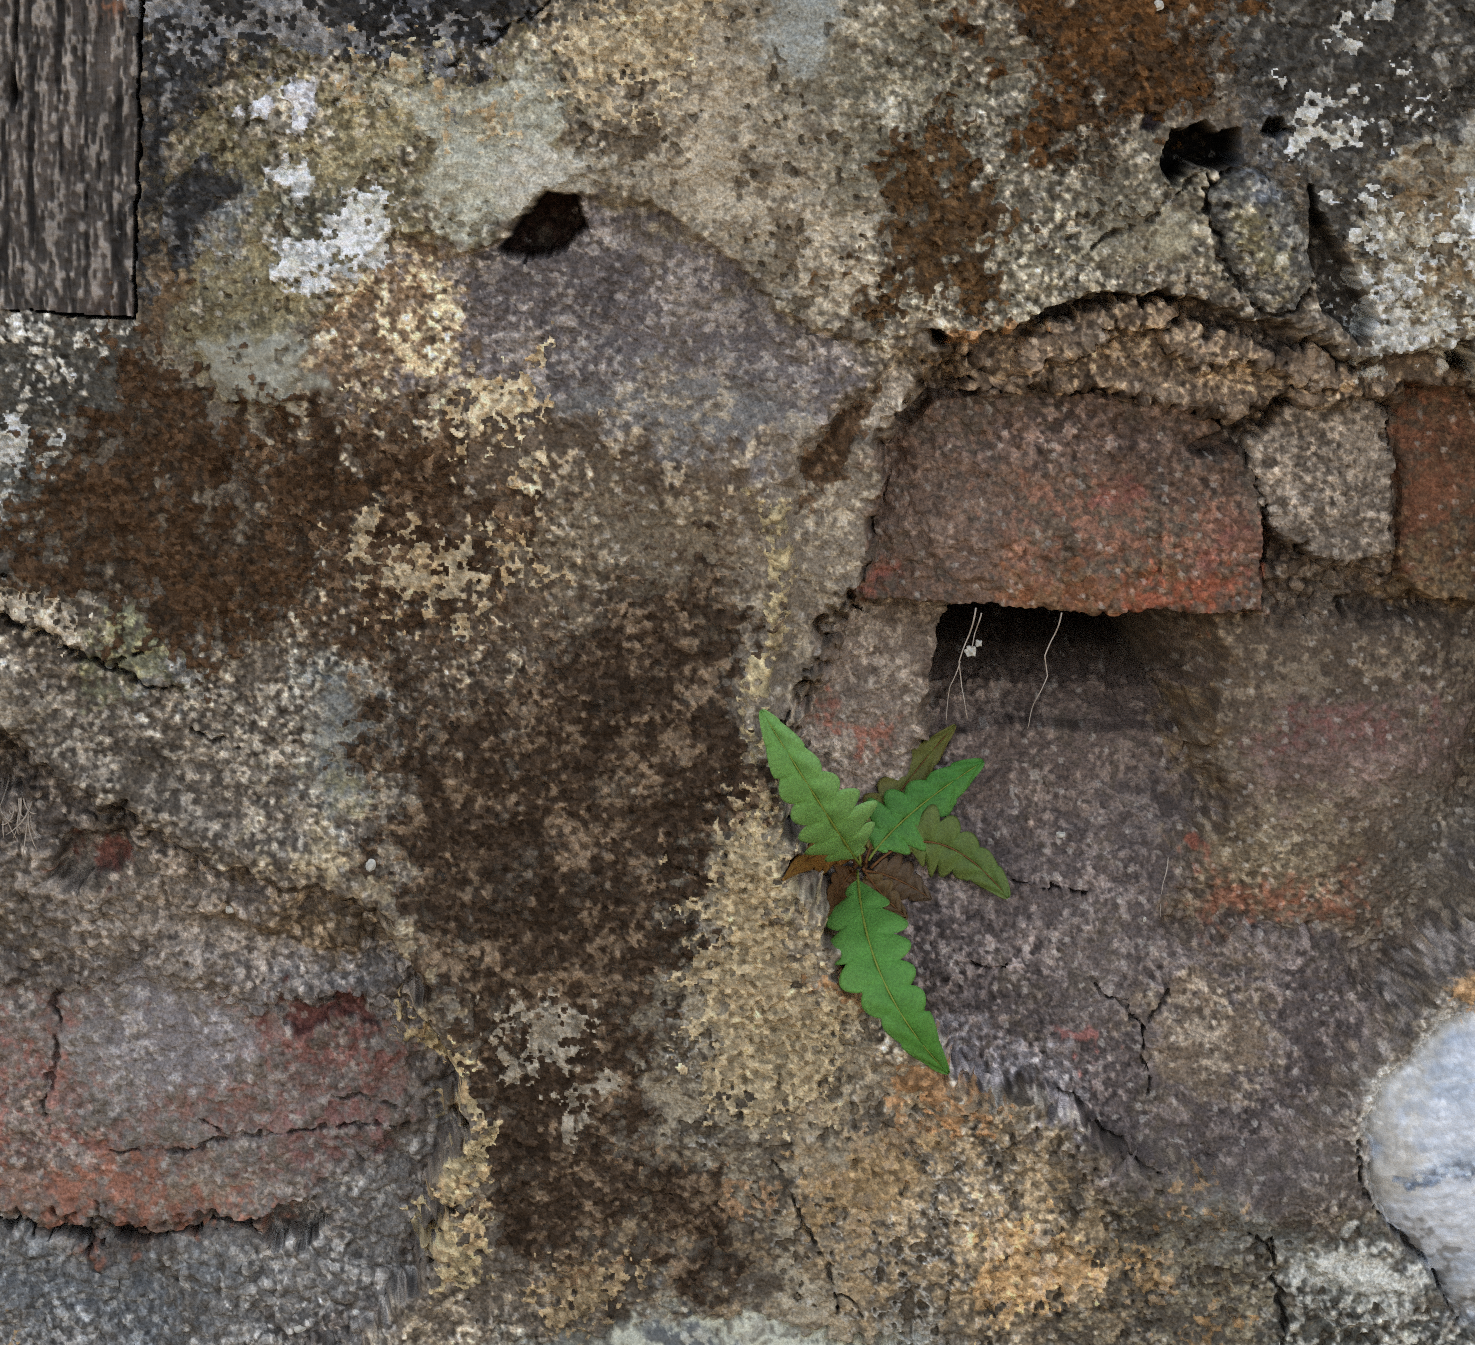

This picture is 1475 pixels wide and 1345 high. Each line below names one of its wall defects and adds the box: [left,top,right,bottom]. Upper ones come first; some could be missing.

damp [114,0,559,306]
crack [1090,164,1367,345]
spalling [318,203,860,655]
spalling [878,290,1475,623]
crack [0,574,189,691]
crack [190,727,241,753]
crack [1012,879,1088,896]
spalling [661,487,1475,1179]
crack [41,988,63,1118]
crack [1091,975,1172,1031]
crack [111,1092,412,1155]
crack [1046,1081,1165,1177]